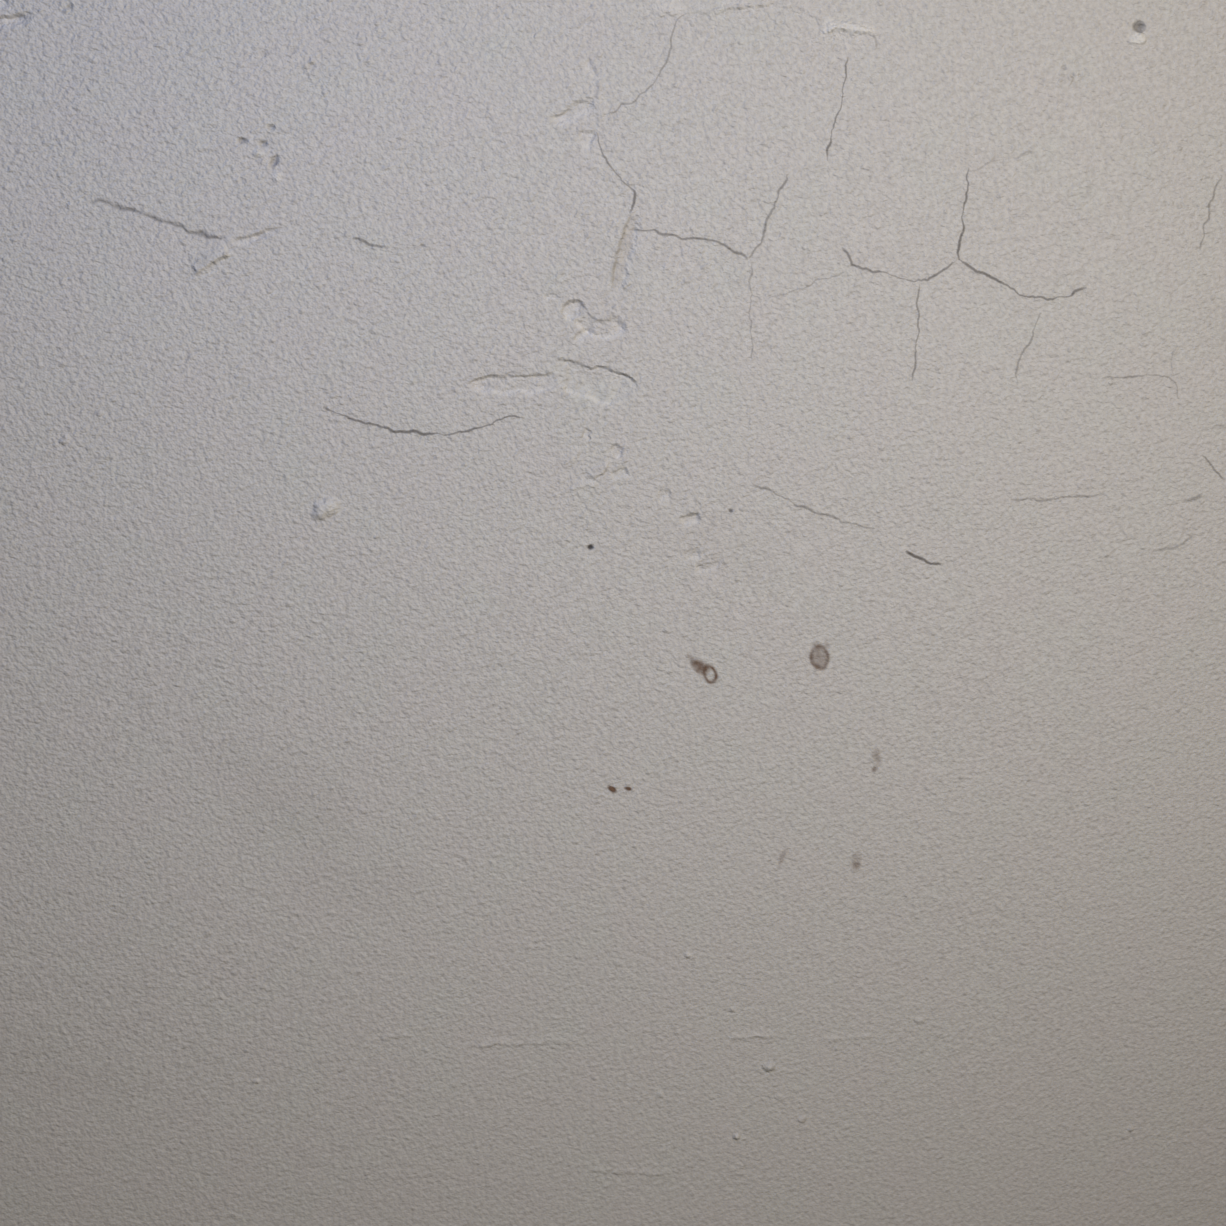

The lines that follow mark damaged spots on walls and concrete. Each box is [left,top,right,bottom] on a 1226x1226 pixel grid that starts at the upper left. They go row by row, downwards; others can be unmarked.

crack [79,193,288,285]